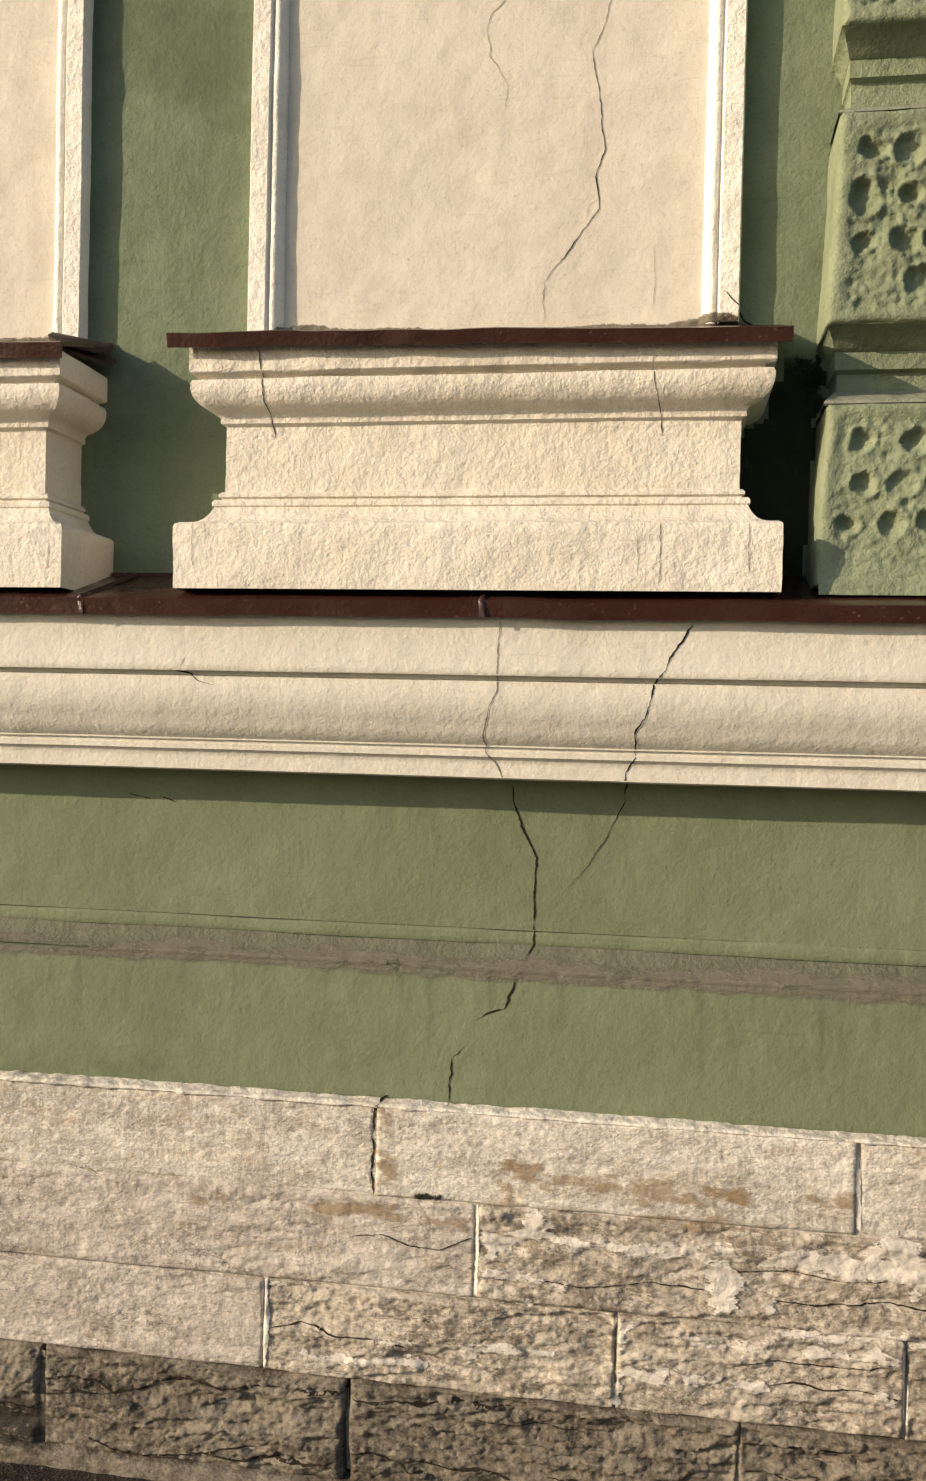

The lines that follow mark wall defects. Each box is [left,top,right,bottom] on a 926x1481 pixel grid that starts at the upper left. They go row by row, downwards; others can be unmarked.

crack [487,0,508,108]
crack [539,1,611,318]
crack [447,626,692,1106]
crack [370,1095,388,1194]
crack [354,1234,472,1251]